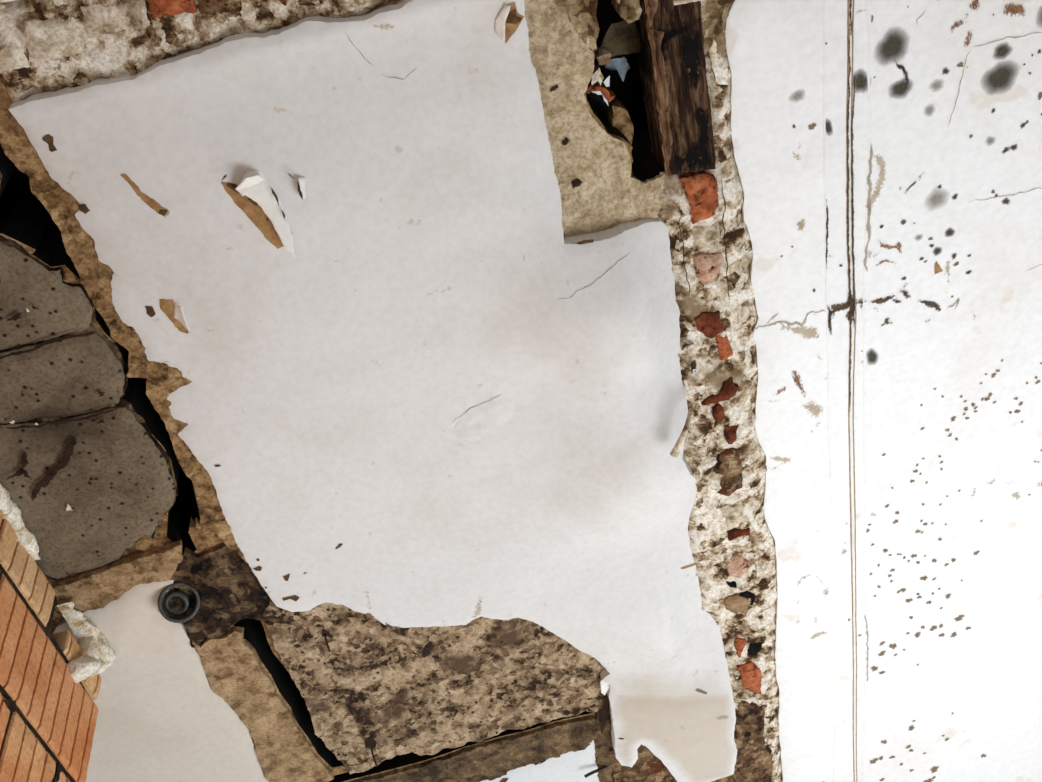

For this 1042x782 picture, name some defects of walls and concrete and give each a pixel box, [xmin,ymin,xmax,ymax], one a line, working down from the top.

spalling [42,134,57,152]
flaking render [495,0,664,245]
damp [855,72,875,90]
damp [879,32,910,96]
crack [949,32,1042,123]
damp [985,45,1041,91]
peeling [235,170,295,257]
crack [753,242,959,330]
damp [866,504,956,609]
damp [907,615,971,638]
spalling [264,595,611,774]
spalling [609,738,676,782]